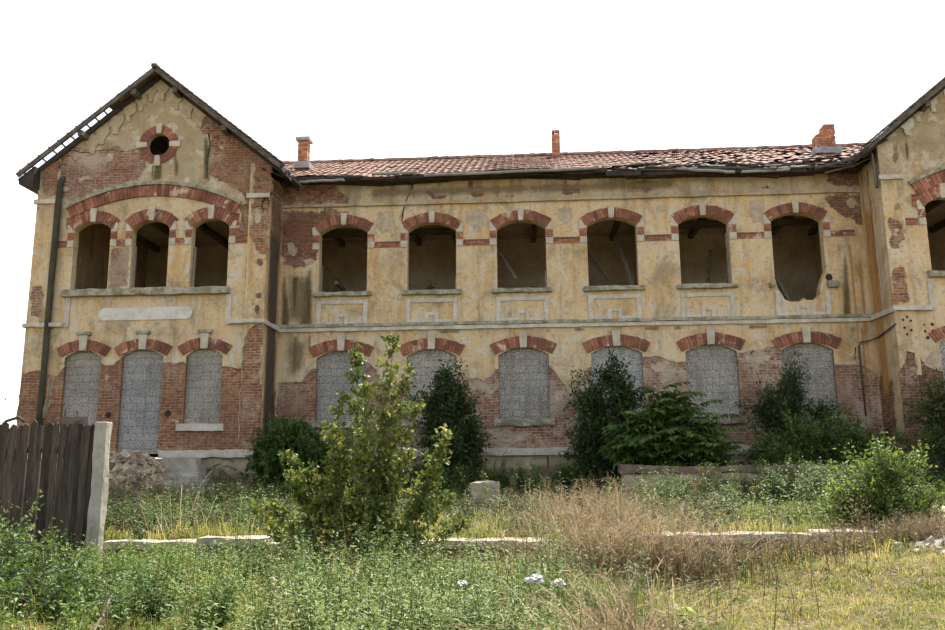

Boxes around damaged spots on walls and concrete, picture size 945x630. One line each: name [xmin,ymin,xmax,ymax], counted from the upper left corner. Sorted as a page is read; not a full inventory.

flaking render [42,80,349,268]
flaking render [824,170,863,228]
flaking render [888,203,905,249]
flaking render [891,265,910,305]
flaking render [97,352,128,451]
flaking render [157,293,263,451]
flaking render [273,362,432,449]
flaking render [455,365,599,448]
flaking render [642,354,688,410]
flaking render [704,345,783,446]
flaking render [826,350,945,444]